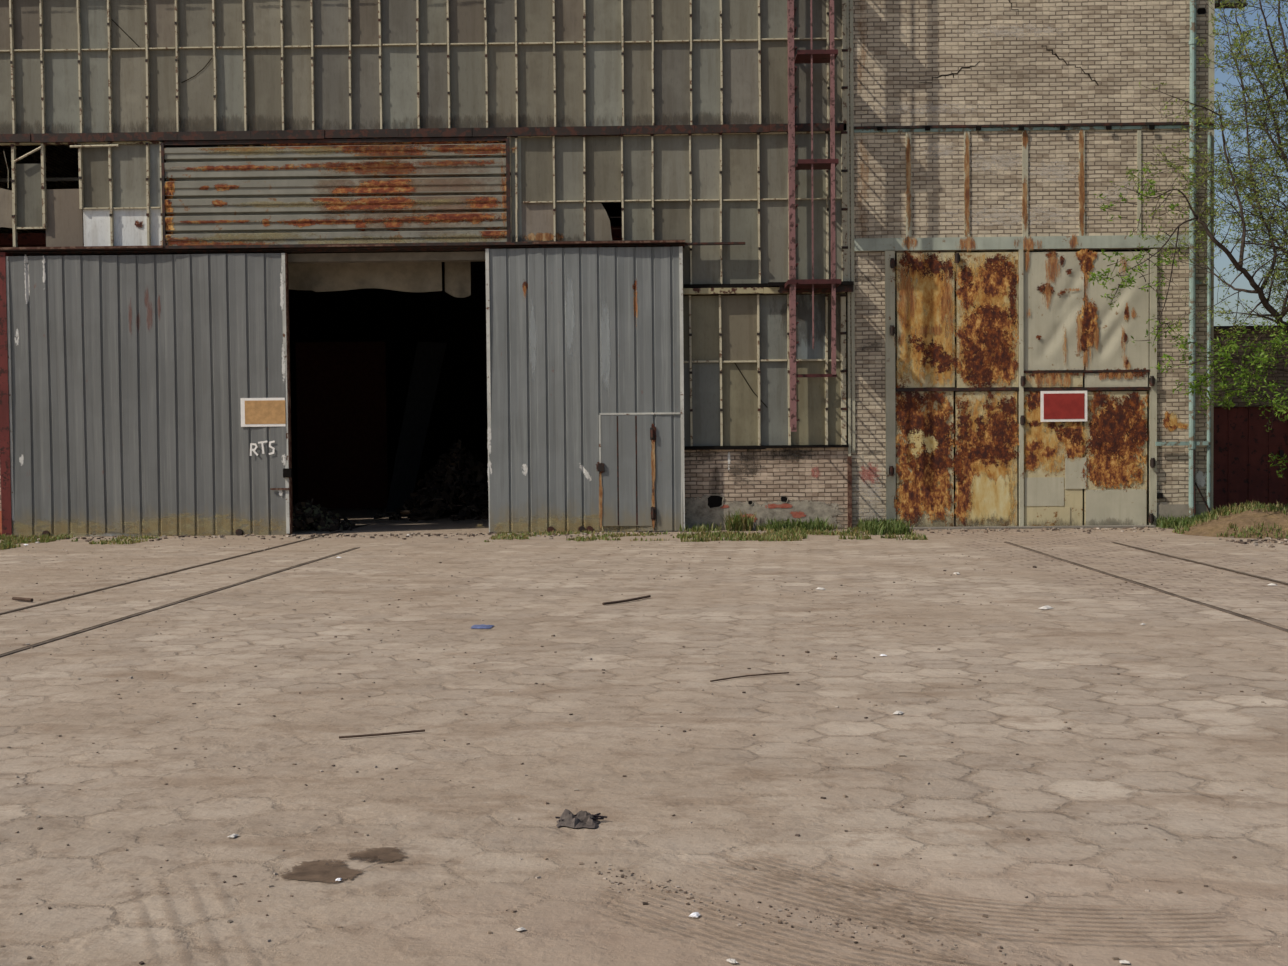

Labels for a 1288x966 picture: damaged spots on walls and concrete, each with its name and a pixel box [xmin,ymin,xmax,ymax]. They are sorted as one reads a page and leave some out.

crack [919,61,980,83]
crack [1046,47,1098,85]
corrosion [161,138,516,246]
corrosion [525,233,564,241]
corrosion [893,130,1148,527]
corrosion [1163,411,1189,431]